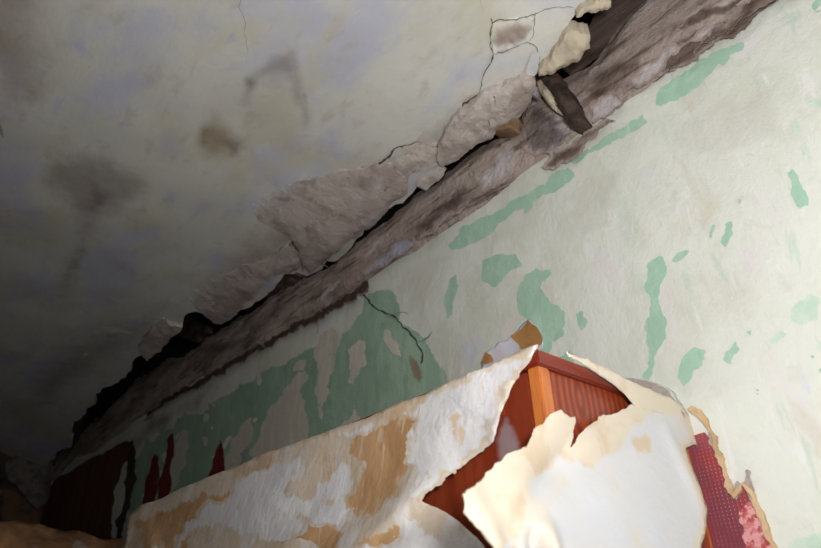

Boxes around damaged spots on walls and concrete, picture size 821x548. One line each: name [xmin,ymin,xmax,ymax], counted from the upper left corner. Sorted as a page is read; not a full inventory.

water stain [0,0,159,306]
water stain [185,39,317,169]
water stain [265,62,527,195]
crack [462,1,570,133]
peeling [442,37,749,252]
water stain [16,214,293,425]
crack [147,239,432,416]
water stain [235,231,364,315]
peeling [480,253,591,368]
peeling [640,249,689,380]
peeling [123,282,452,522]
spalling [688,406,821,548]